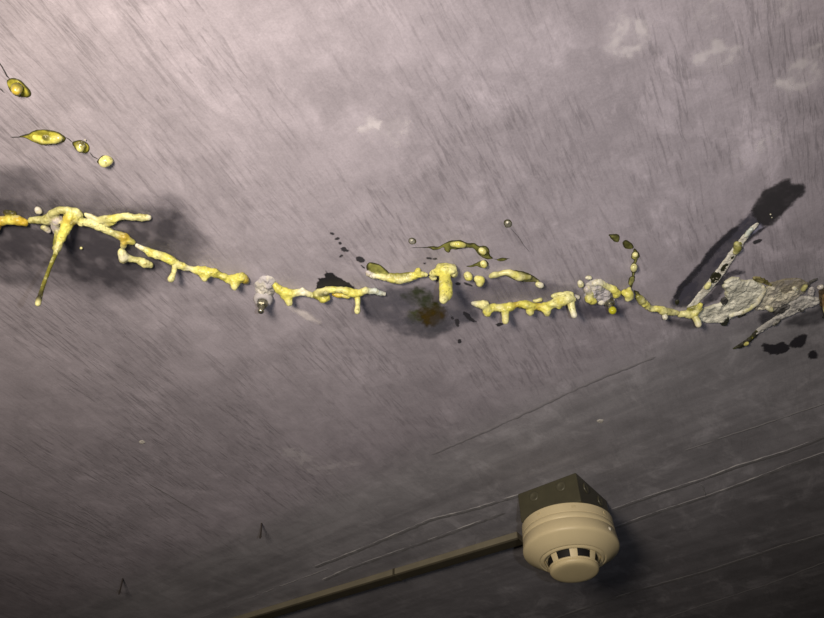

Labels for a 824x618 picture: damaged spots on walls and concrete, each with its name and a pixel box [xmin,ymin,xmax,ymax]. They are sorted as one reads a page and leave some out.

water stain [0,175,54,281]
water stain [66,212,195,292]
corrosion [411,287,444,326]
water stain [669,179,824,359]